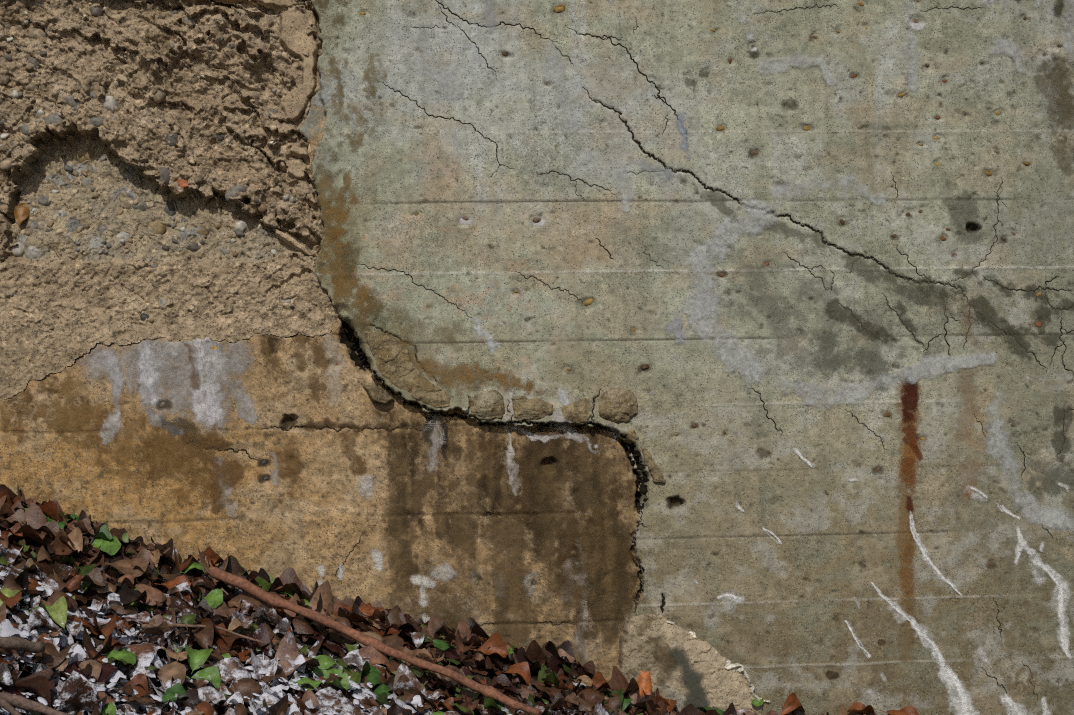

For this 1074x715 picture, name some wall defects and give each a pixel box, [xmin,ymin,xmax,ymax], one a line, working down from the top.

spalling [0,0,338,399]
crack [376,0,1074,378]
crack [355,262,474,319]
damp [2,337,257,517]
spalling [258,459,270,483]
spalling [280,418,296,428]
damp [304,419,373,496]
damp [371,336,637,665]
corrosion [900,367,922,512]
efflorescence [871,582,980,715]
efflorescence [910,511,962,596]
damp [999,505,1071,658]